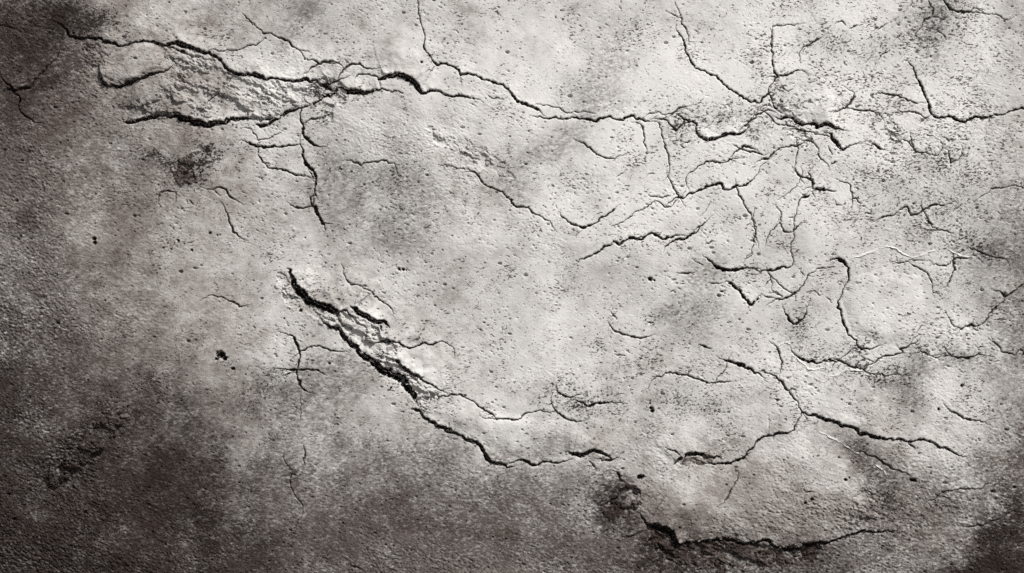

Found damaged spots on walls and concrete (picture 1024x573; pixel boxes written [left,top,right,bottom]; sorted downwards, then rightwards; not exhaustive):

spalling [118,46,348,125]
crack [3,13,499,240]
spalling [275,274,436,411]
crack [275,264,626,483]
crack [417,0,1024,503]
crack [599,512,900,551]